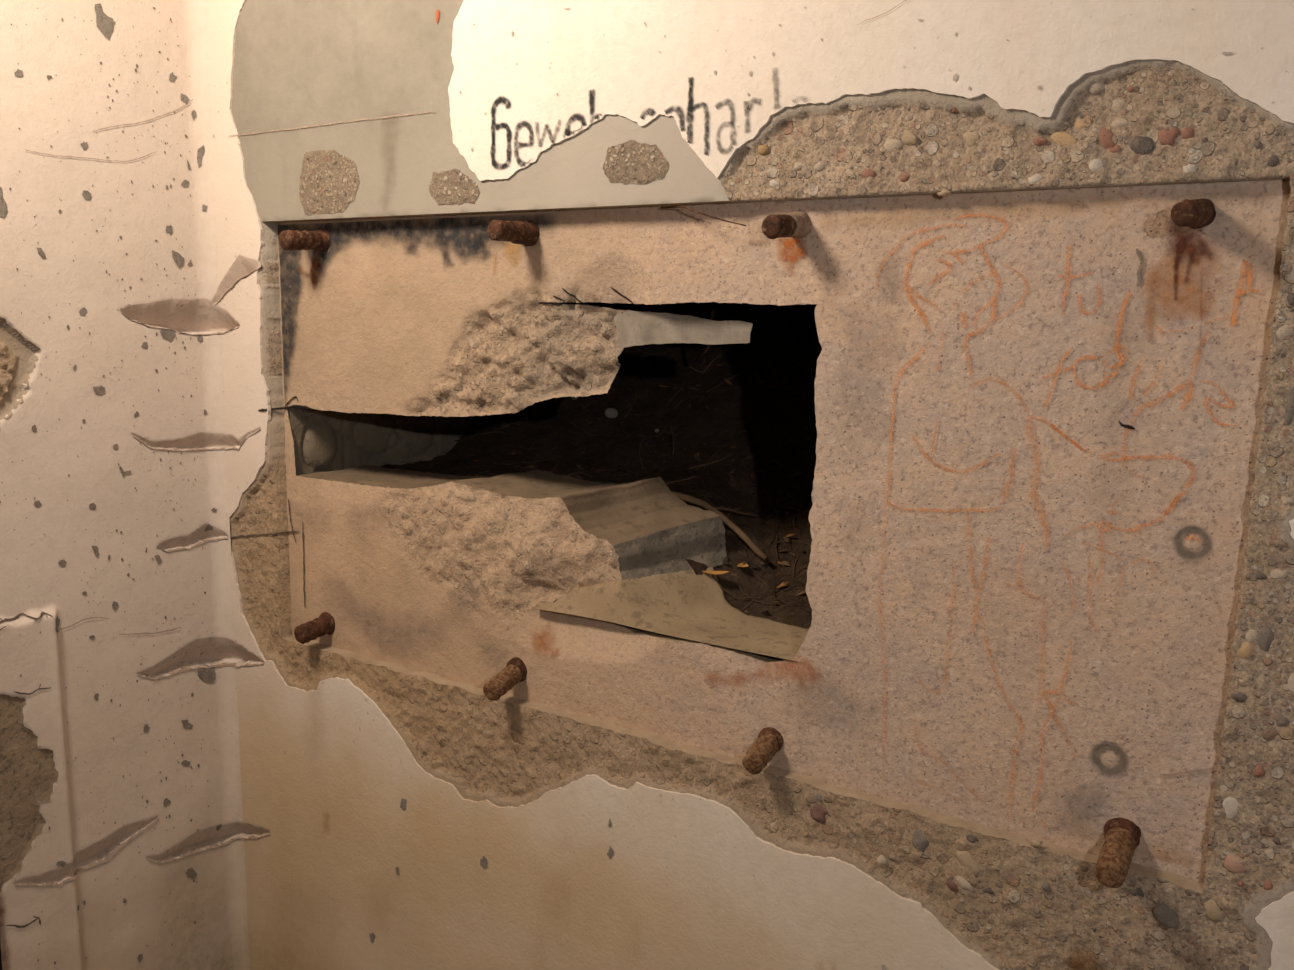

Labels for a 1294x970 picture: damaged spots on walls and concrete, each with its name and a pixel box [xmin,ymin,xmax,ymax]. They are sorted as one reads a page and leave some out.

flaking render [231,0,729,222]
rust [781,238,805,262]
rust [1160,226,1210,307]
spalling [0,317,42,420]
spalling [230,60,1294,970]
flaking render [0,694,58,892]